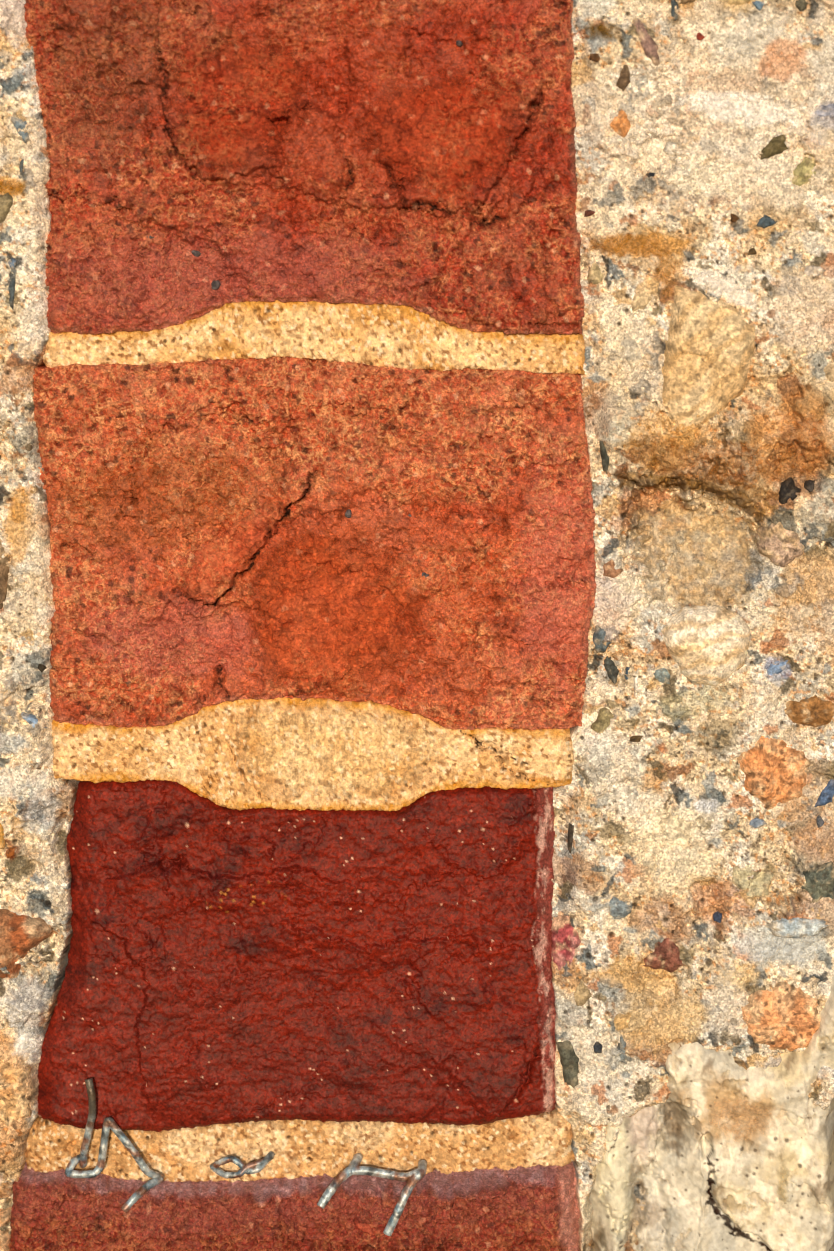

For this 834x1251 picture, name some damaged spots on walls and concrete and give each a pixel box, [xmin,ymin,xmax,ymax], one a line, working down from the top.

crack [185,476,311,606]
crack [705,1137,771,1251]